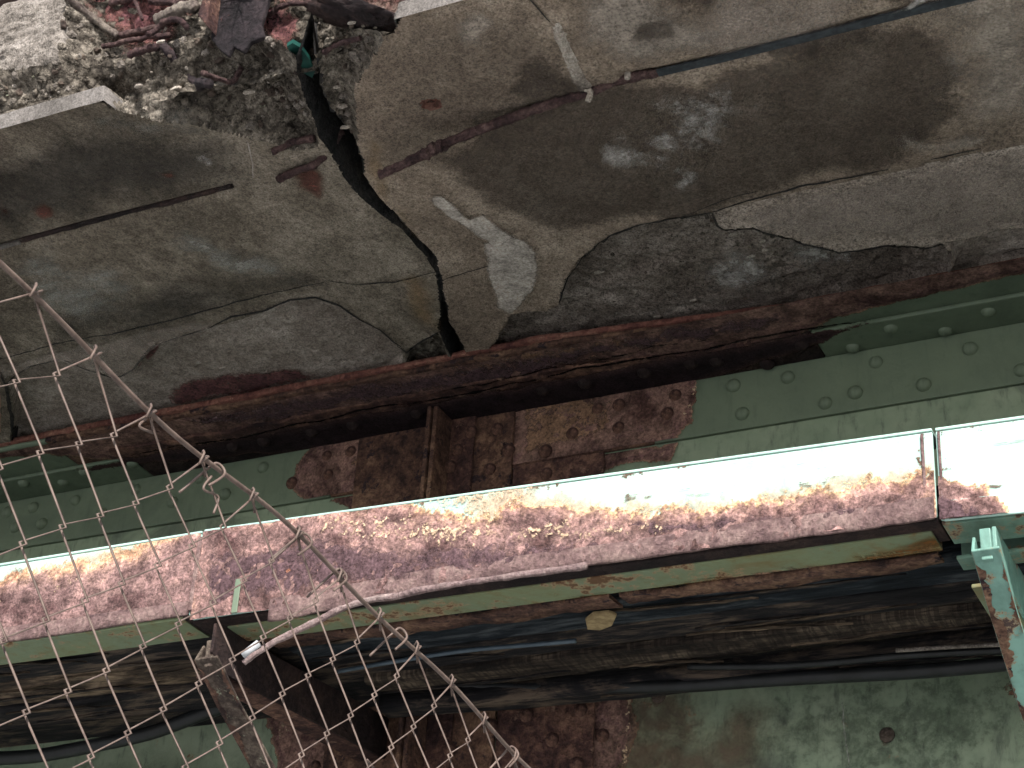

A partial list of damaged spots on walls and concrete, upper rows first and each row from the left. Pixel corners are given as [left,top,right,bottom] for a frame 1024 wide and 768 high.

spalling [0,0,397,184]
spalling [363,0,405,13]
damp [591,0,701,56]
damp [448,27,961,226]
crack [0,13,487,441]
spalling [489,214,1024,348]
corrosion [0,258,1024,509]
corrosion [264,539,944,649]